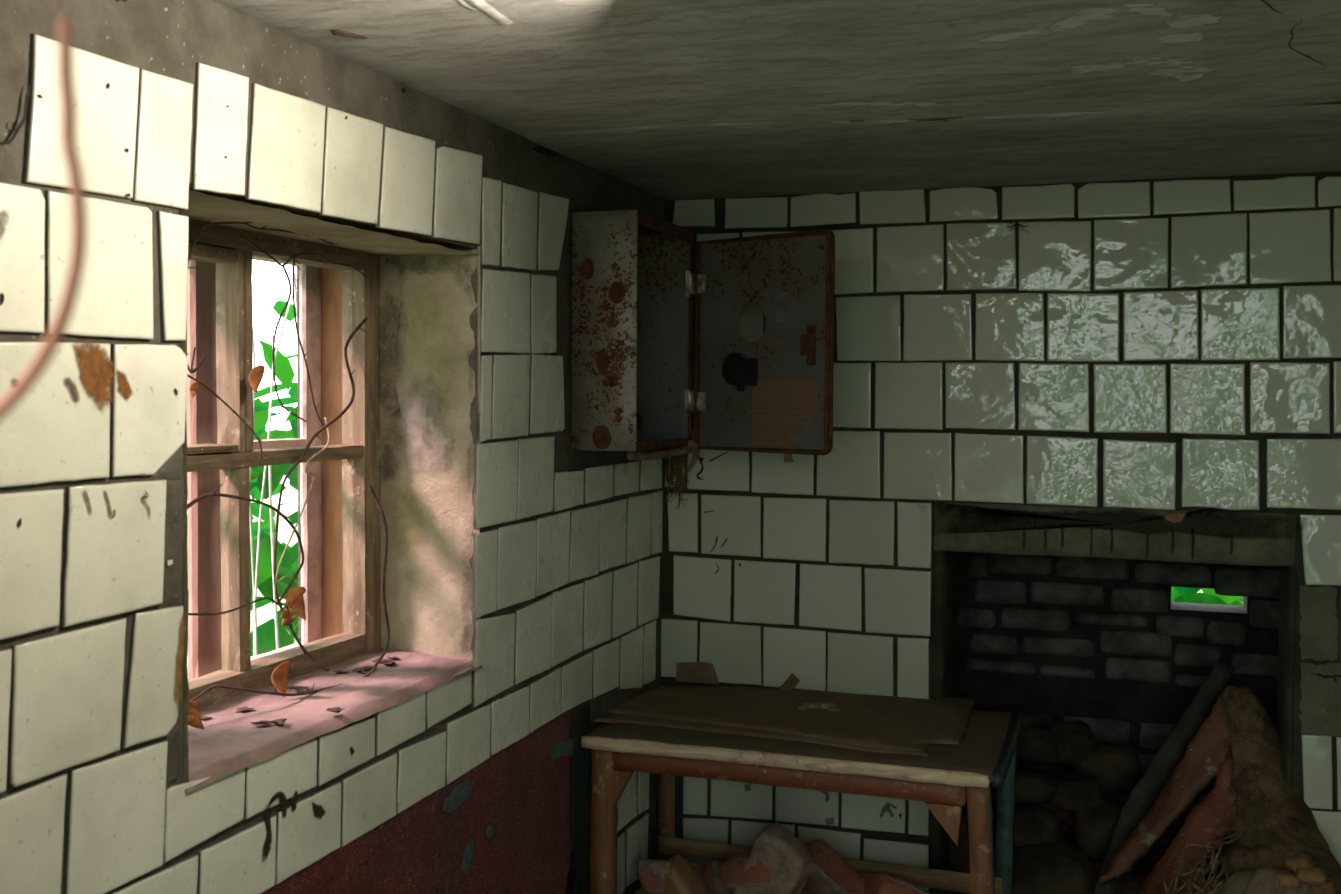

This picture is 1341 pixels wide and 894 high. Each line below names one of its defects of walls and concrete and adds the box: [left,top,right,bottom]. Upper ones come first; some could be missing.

spalling [330,30,368,39]
crack [1260,0,1327,67]
peeling [0,24,43,179]
corrosion [65,341,132,409]
peeling [1299,585,1341,737]